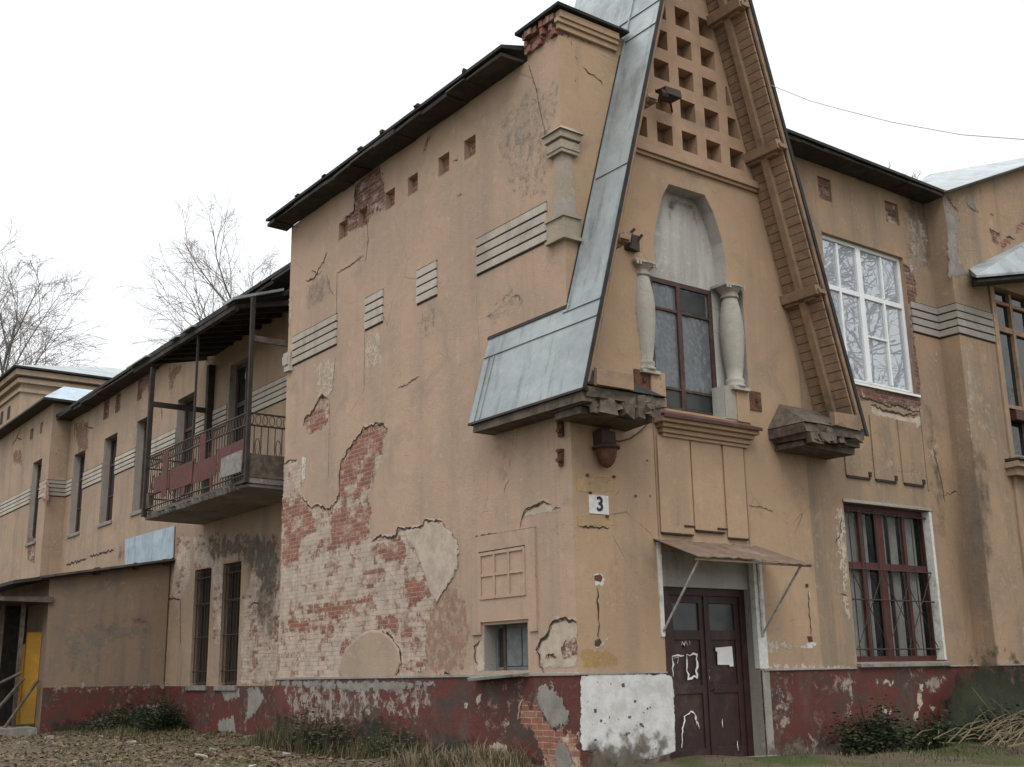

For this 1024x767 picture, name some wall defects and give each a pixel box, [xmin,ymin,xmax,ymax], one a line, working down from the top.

flaking render [529,23,592,50]
flaking render [343,166,385,232]
crack [307,226,368,307]
flaking render [303,357,336,434]
spalling [520,499,560,519]
flaking render [169,534,229,646]
damp [205,534,279,624]
flaking render [217,420,485,733]
spalling [535,616,578,673]
flaking render [489,699,597,767]
peeling [764,639,856,728]
peeling [913,676,945,721]